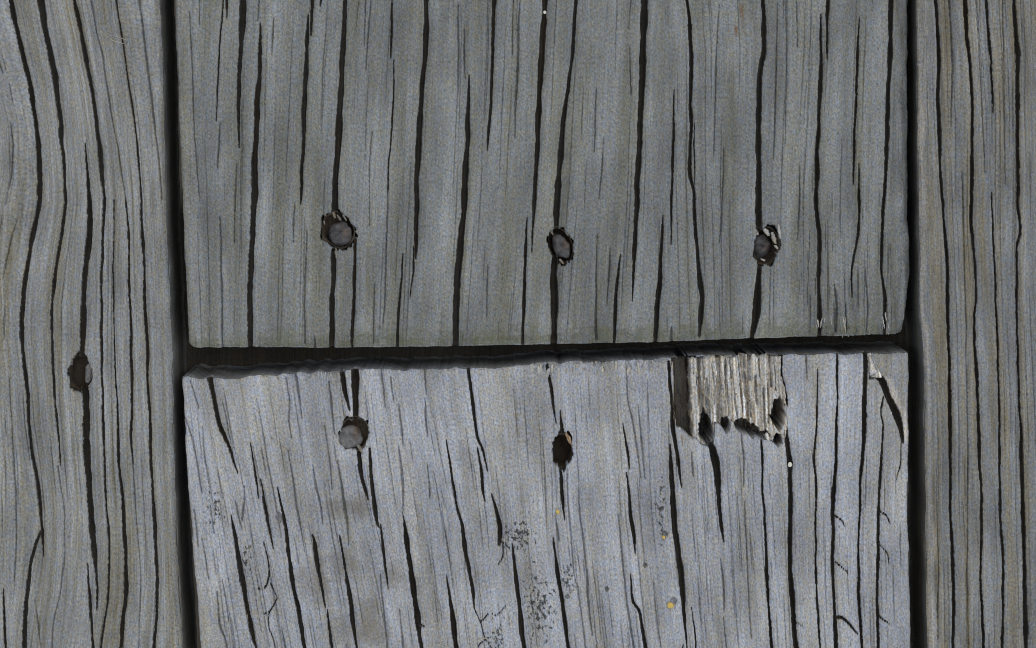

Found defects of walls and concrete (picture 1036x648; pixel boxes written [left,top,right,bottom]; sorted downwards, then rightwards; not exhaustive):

crack [755,0,767,229]
spalling [671,353,788,446]
crack [750,265,762,338]
crack [760,0,904,648]